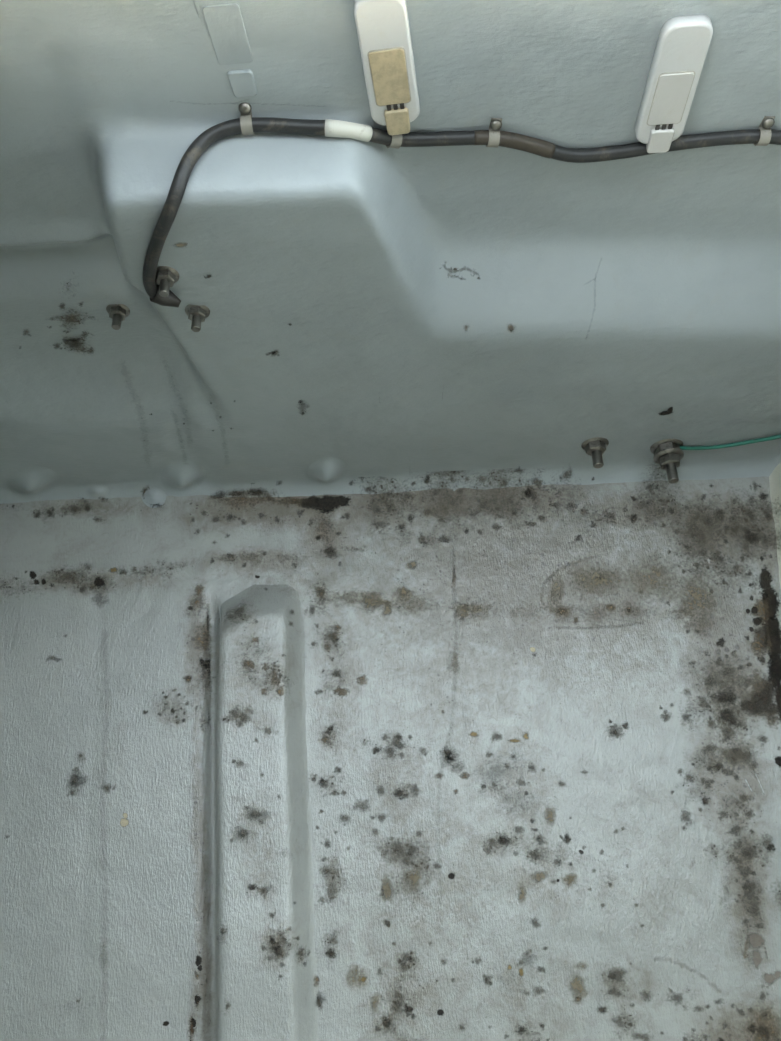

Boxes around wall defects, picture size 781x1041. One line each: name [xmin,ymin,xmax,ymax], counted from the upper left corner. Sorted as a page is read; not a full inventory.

water stain [192,489,359,566]
water stain [0,562,175,602]
water stain [185,587,214,682]
water stain [228,603,295,696]
water stain [290,587,422,695]
water stain [223,709,255,726]
water stain [349,465,781,928]
water stain [341,800,385,834]
water stain [320,832,346,902]
water stain [262,928,309,977]
water stain [372,984,414,1031]
water stain [684,993,780,1041]